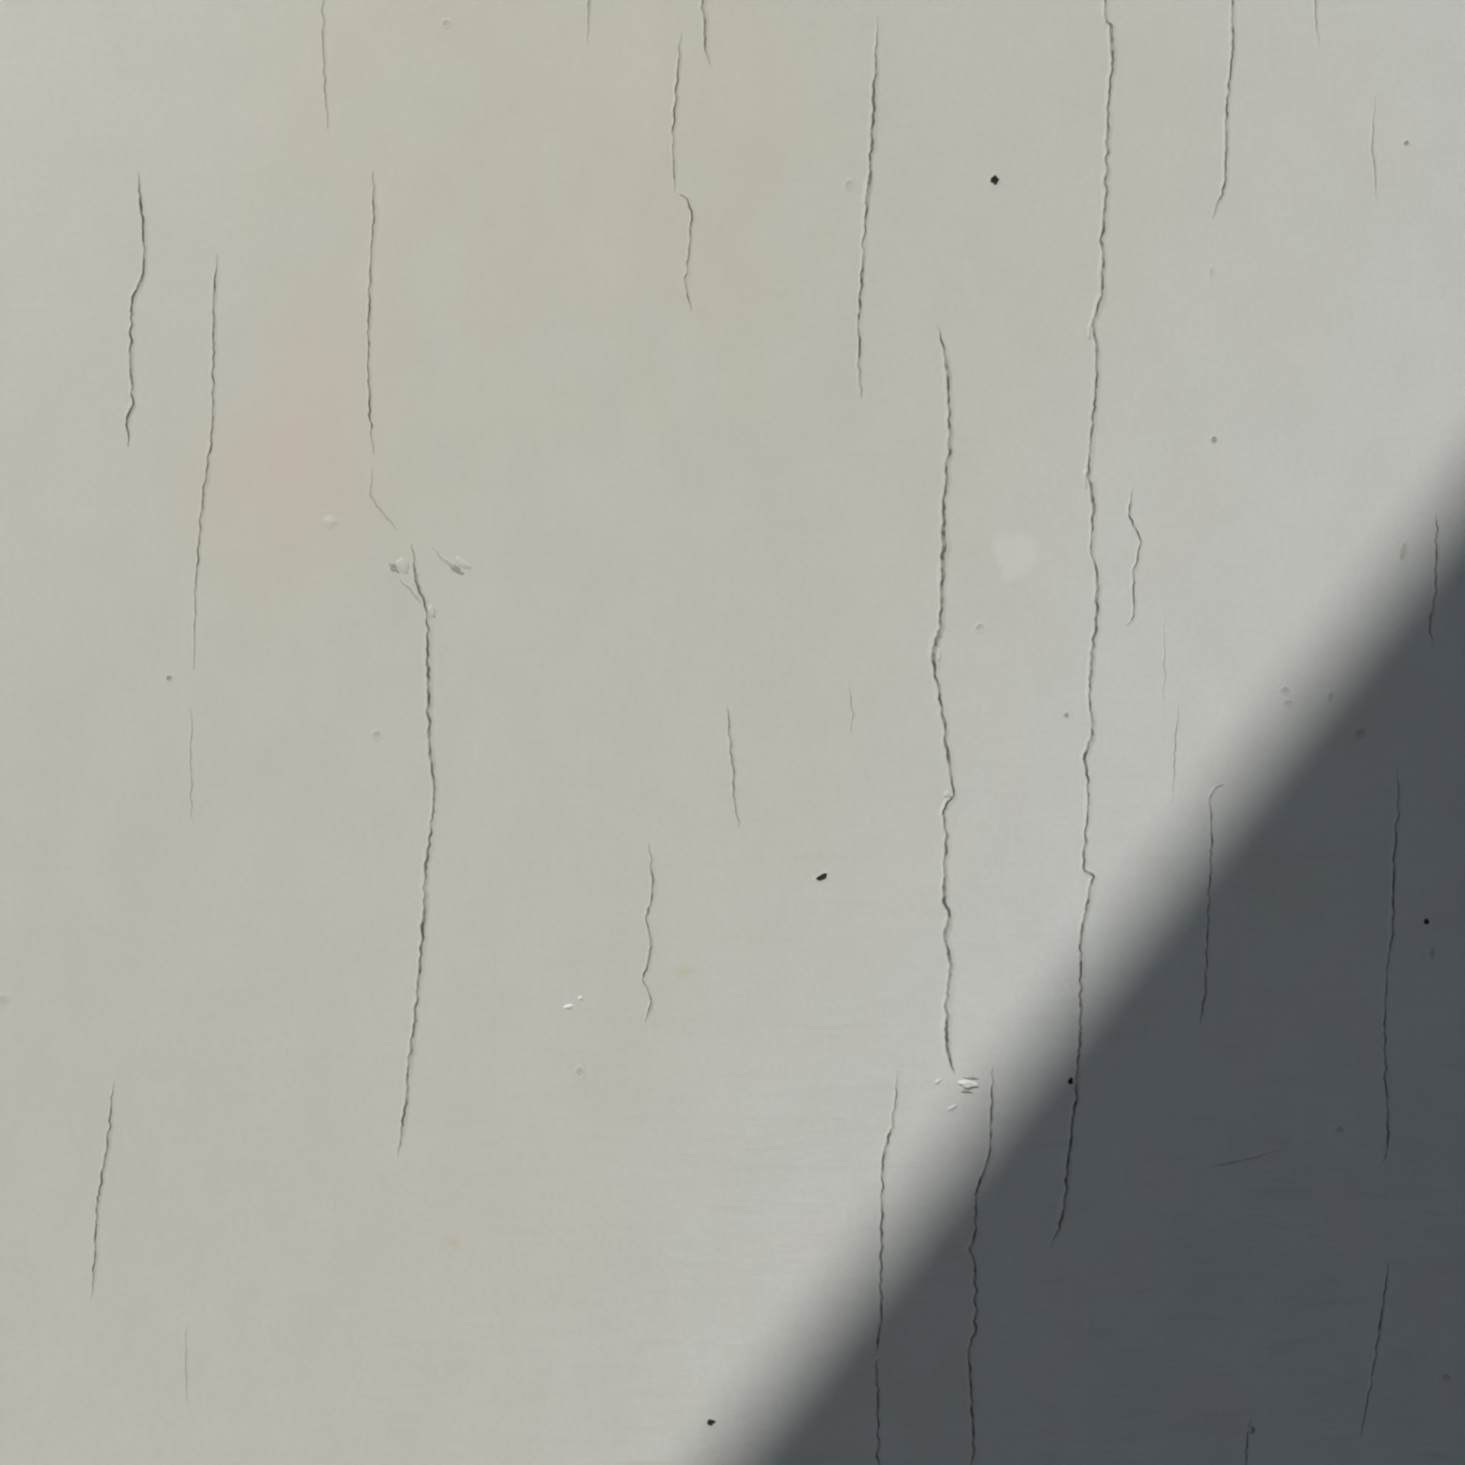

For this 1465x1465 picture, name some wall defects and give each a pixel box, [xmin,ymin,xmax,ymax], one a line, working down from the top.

crack [123,172,149,447]
crack [669,0,711,312]
crack [854,16,881,398]
crack [1211,0,1238,219]
crack [365,171,455,1156]
crack [1050,0,1225,1248]
crack [639,843,657,1022]
crack [927,324,997,1465]
crack [1380,766,1402,1164]
crack [90,1080,116,1300]
crack [869,1070,900,1465]
crack [1359,1261,1389,1438]